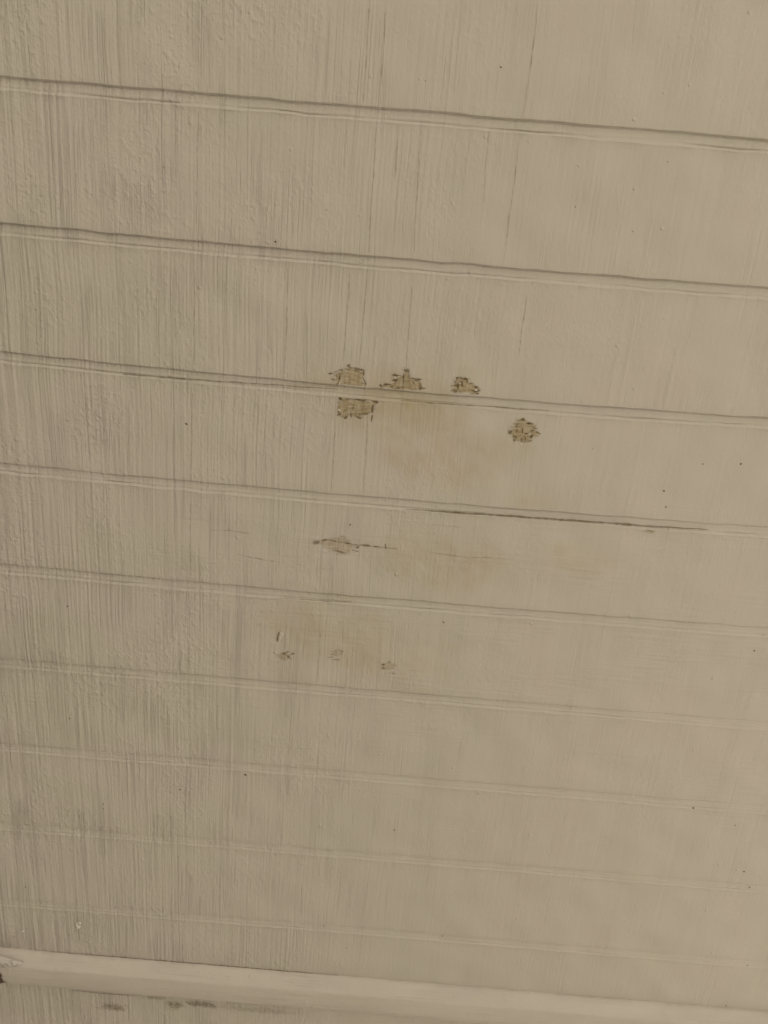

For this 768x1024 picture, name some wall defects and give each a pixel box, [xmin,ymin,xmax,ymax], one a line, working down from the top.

peeling [328,365,426,422]
peeling [449,375,481,395]
peeling [508,418,542,444]
crack [405,509,709,530]
peeling [312,536,386,555]